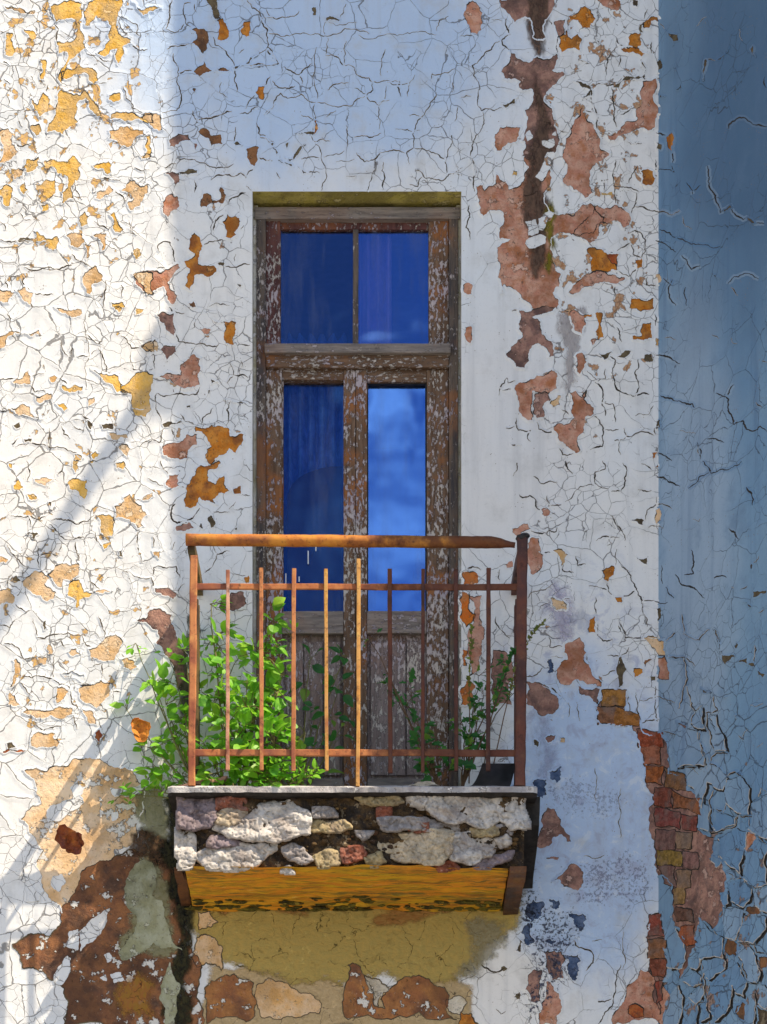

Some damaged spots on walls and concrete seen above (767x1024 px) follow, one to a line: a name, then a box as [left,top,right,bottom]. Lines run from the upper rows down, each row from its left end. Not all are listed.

peeling [2,0,320,175]
crack [0,0,512,270]
water stain [526,0,548,55]
water stain [522,84,556,278]
peeling [474,0,680,456]
crack [0,514,136,732]
peeling [0,231,246,558]
crack [0,213,251,593]
crack [506,130,767,845]
spalling [0,619,322,1024]
water stain [129,796,473,1024]
flaking render [458,564,767,1024]